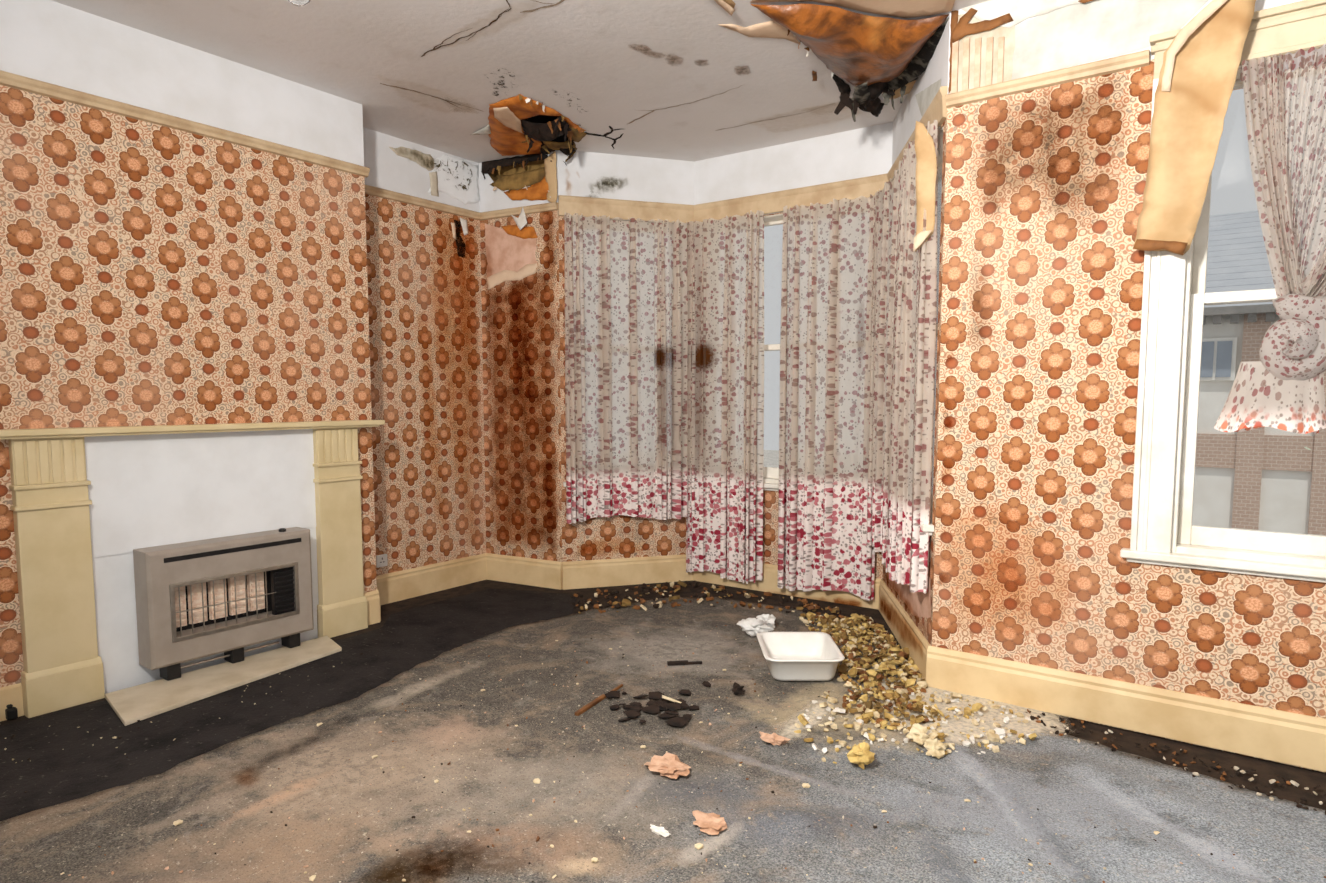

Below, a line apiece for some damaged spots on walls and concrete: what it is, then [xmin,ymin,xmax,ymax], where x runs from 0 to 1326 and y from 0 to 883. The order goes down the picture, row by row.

crack [380,83,481,111]
spalling [389,94,584,278]
crack [421,0,565,57]
peeling [913,79,941,252]
peeling [1133,0,1256,256]